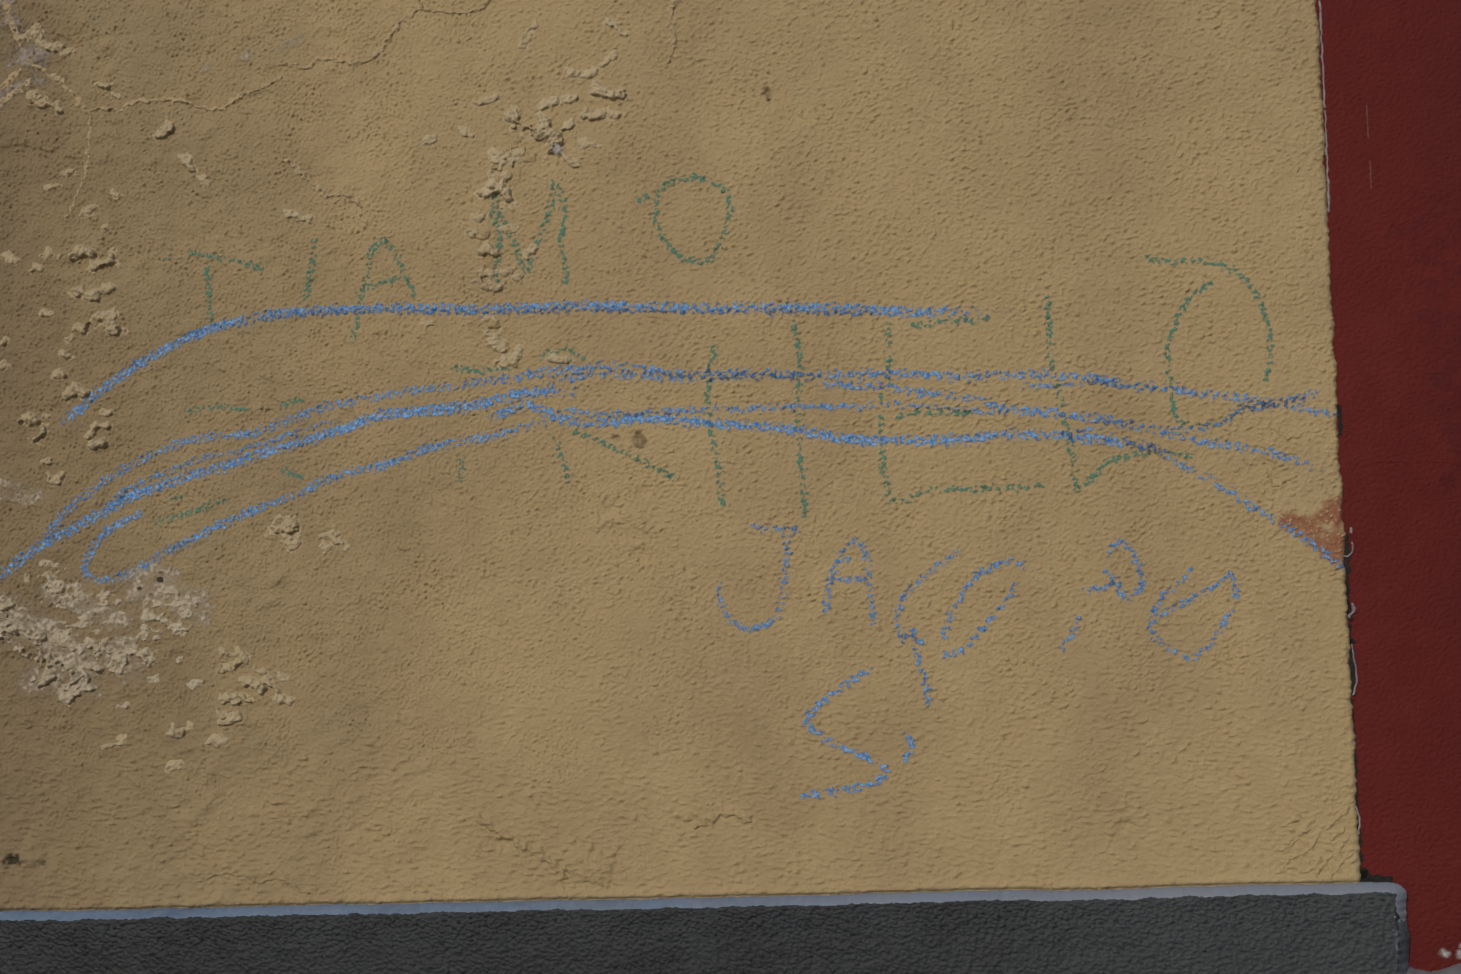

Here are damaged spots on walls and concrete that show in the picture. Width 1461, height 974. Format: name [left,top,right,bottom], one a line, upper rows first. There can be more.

spalling [0,559,216,709]